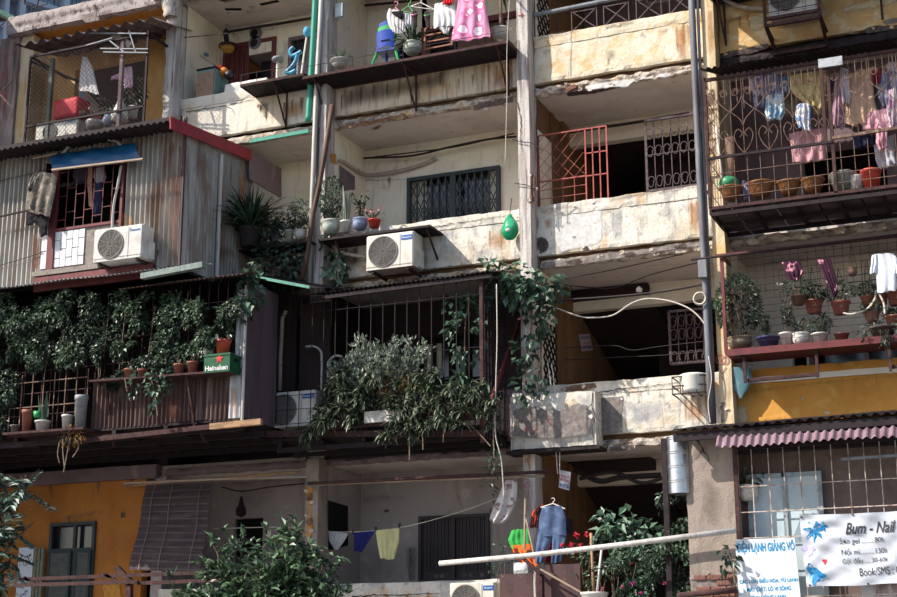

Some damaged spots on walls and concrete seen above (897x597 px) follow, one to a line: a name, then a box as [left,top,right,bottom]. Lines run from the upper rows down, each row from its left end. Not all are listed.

spalling [473,96,513,110]
spalling [564,70,683,96]
peeling [536,201,700,268]
spalling [512,383,624,438]
crack [586,382,679,441]